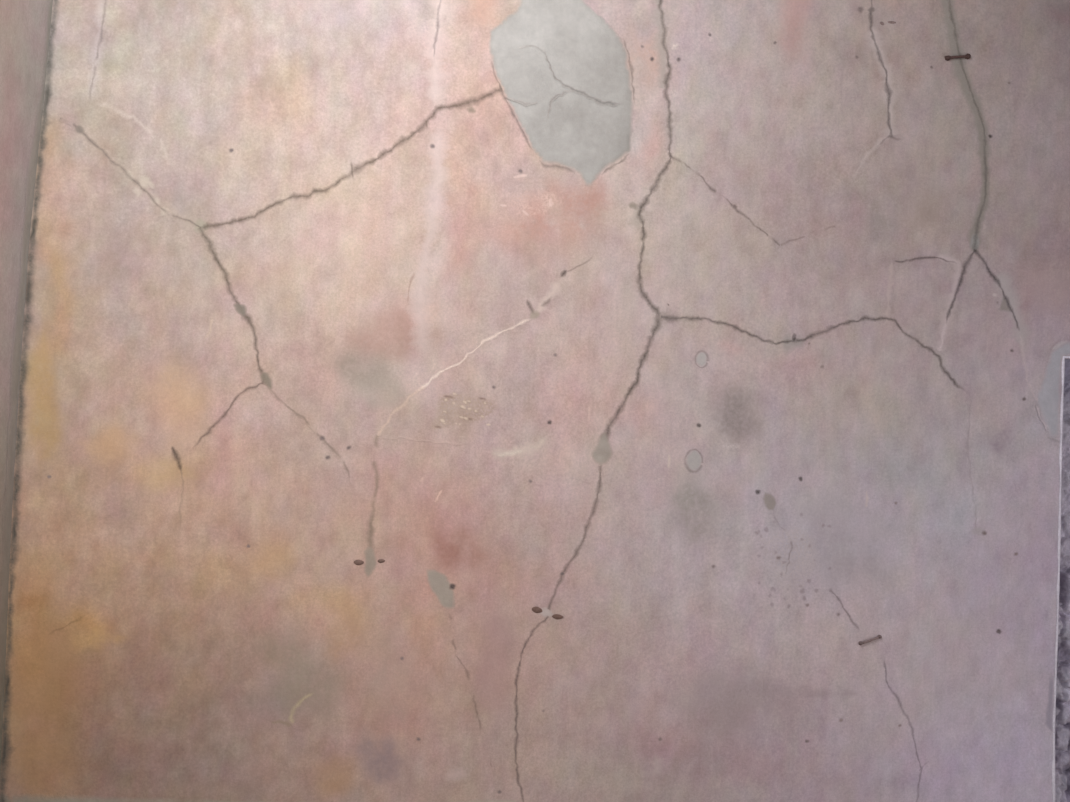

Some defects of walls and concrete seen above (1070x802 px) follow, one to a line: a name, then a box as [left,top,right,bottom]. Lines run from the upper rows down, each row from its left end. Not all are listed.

crack [0,0,623,802]
crack [448,0,1040,802]